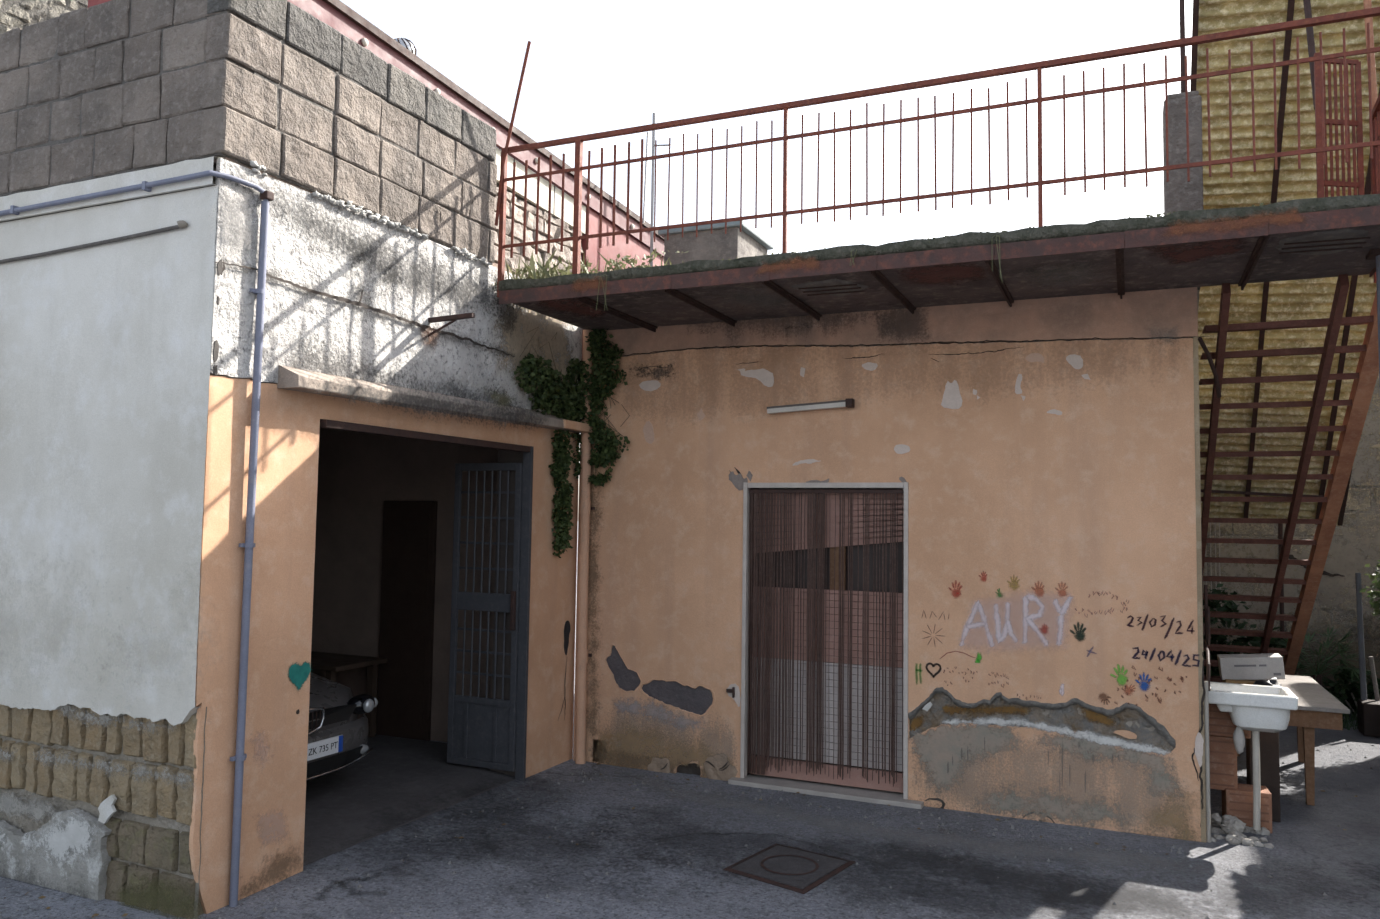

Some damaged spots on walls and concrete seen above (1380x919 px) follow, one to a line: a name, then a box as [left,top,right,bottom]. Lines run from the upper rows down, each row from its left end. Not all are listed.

damp [209,163,573,429]
corrosion [901,263,987,285]
peeling [738,368,774,387]
peeling [941,380,980,409]
peeling [604,644,741,717]
spalling [908,687,1176,755]
peeling [1195,732,1204,767]
spalling [0,704,207,919]